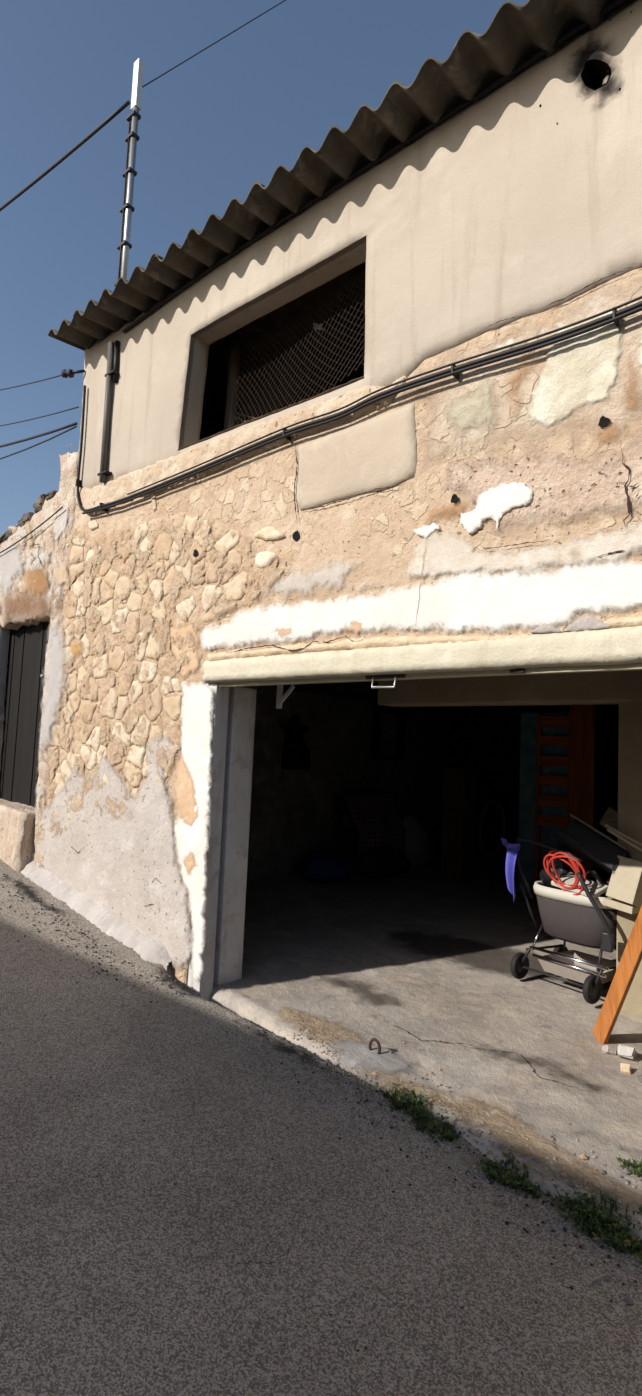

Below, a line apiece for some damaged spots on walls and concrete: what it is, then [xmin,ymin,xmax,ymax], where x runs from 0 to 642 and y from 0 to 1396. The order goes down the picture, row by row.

spalling [485,338,525,356]
spalling [510,311,642,440]
peeling [413,523,442,538]
peeling [451,482,534,535]
crack [597,453,639,557]
spalling [530,616,612,634]
spalling [24,495,299,834]
spalling [183,852,195,872]